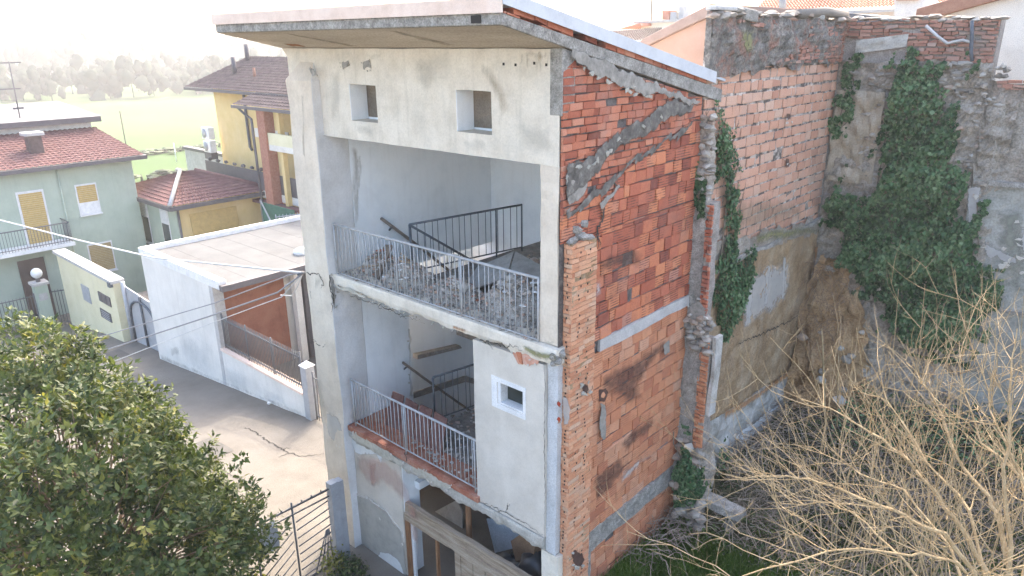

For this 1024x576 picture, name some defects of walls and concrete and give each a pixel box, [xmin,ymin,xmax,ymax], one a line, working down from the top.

spalling [572,48,700,106]
peeling [575,136,622,169]
peeling [511,351,539,366]
crack [246,428,324,457]
spalling [325,414,452,492]